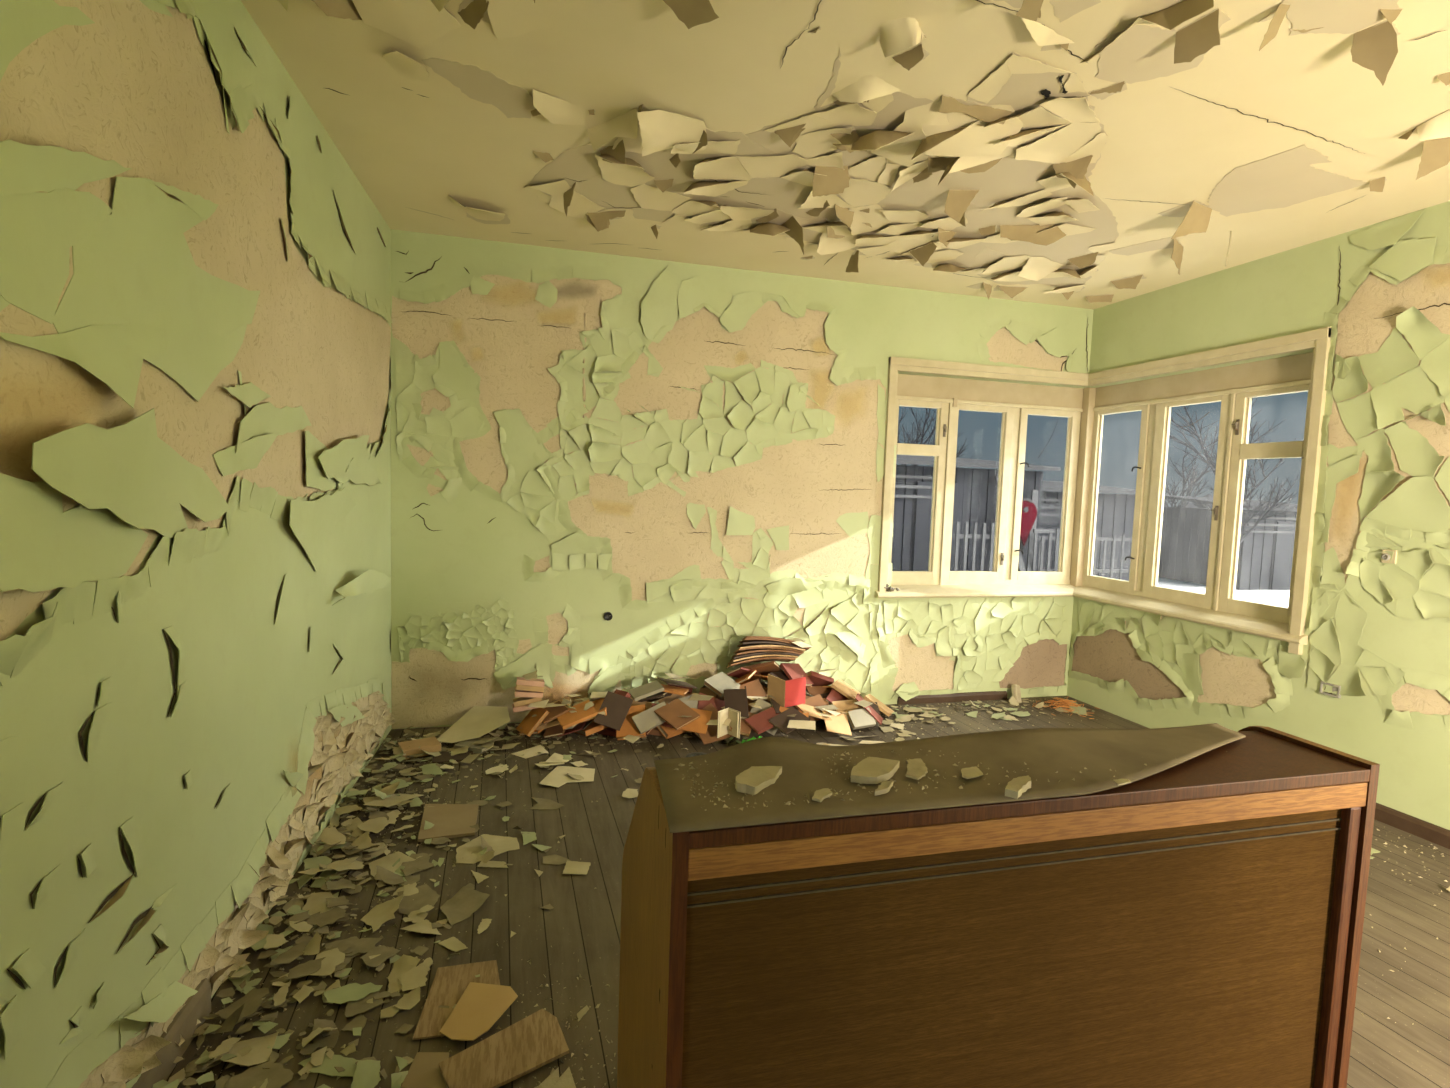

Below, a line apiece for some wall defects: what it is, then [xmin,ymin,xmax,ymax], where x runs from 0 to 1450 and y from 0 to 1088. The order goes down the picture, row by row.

crack [781,0,821,66]
crack [976,0,1091,97]
peeling [1437,72,1450,86]
peeling [312,0,1403,303]
peeling [1398,109,1450,180]
peeling [0,0,897,678]
peeling [977,315,1082,385]
peeling [1311,209,1450,618]
peeling [877,622,983,701]
peeling [1377,667,1450,733]
peeling [0,735,62,868]
peeling [47,599,657,1088]